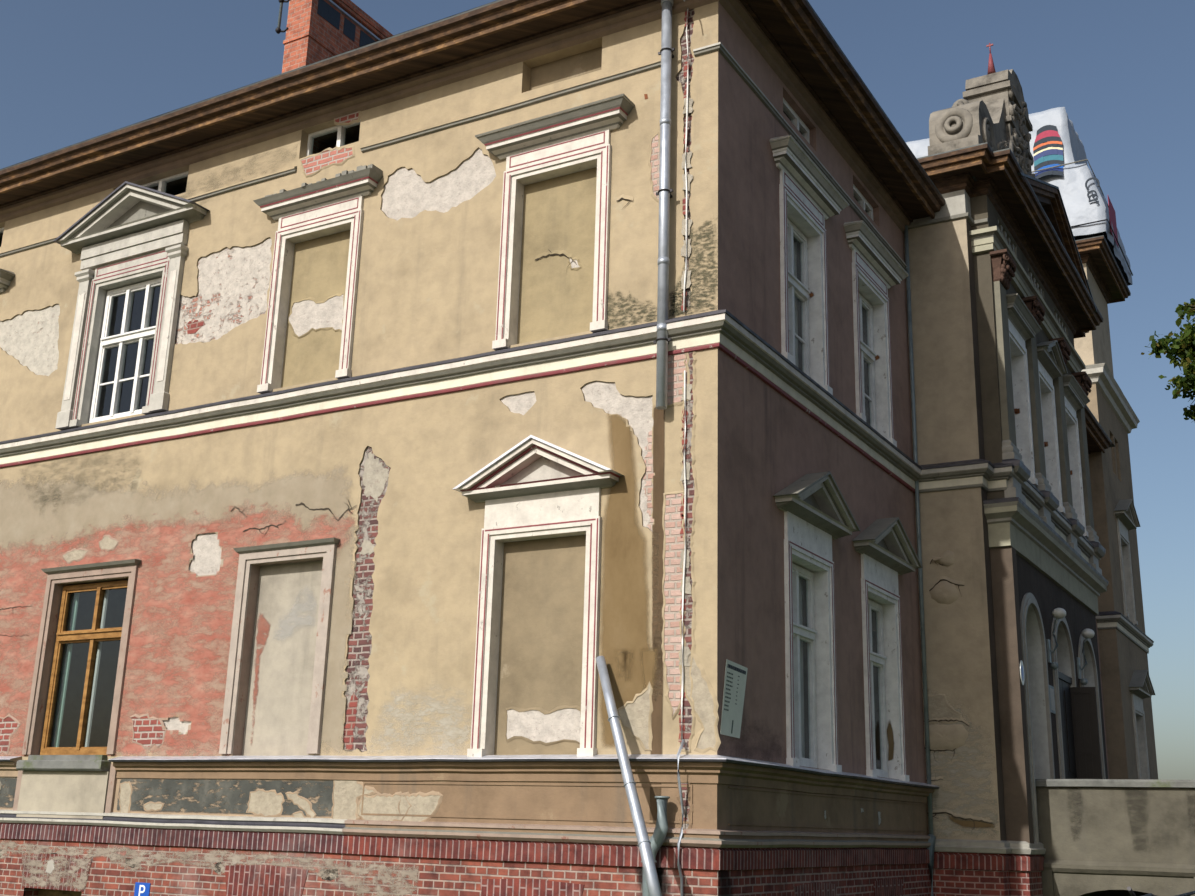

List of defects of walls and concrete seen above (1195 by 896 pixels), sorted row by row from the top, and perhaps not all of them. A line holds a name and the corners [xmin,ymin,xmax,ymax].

flaking render [380,147,496,221]
flaking render [174,237,272,344]
flaking render [0,304,60,376]
crack [231,500,357,538]
flaking render [580,352,721,754]
peeling [0,446,391,756]
peeling [505,705,581,746]
peeling [0,777,17,808]
peeling [117,779,443,822]